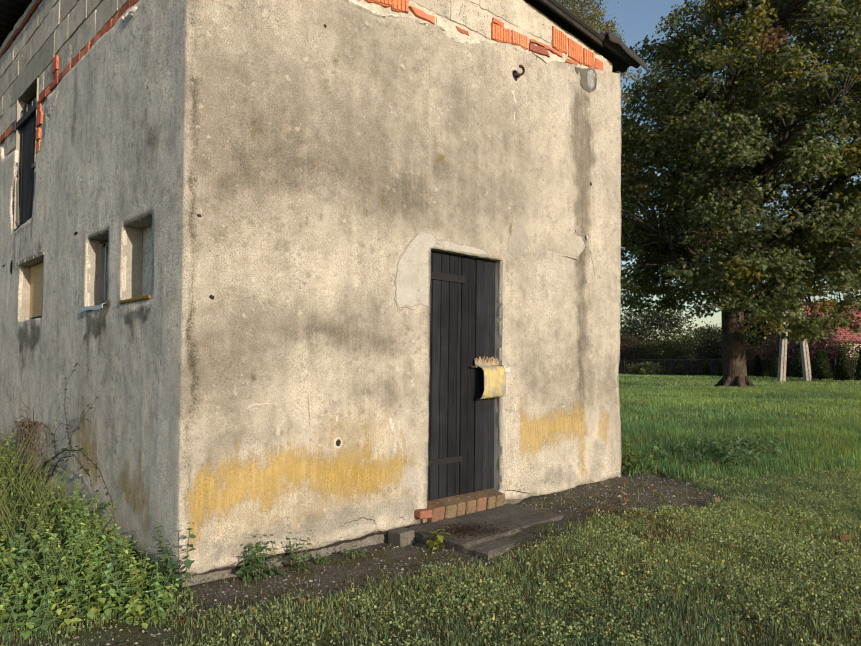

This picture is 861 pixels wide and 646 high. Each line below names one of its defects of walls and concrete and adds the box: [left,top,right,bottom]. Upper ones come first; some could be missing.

spalling [122,7,137,22]
leakage [573,87,594,352]
leakage [84,300,110,339]
leakage [125,308,150,324]
leakage [514,404,586,452]
leakage [190,444,407,540]